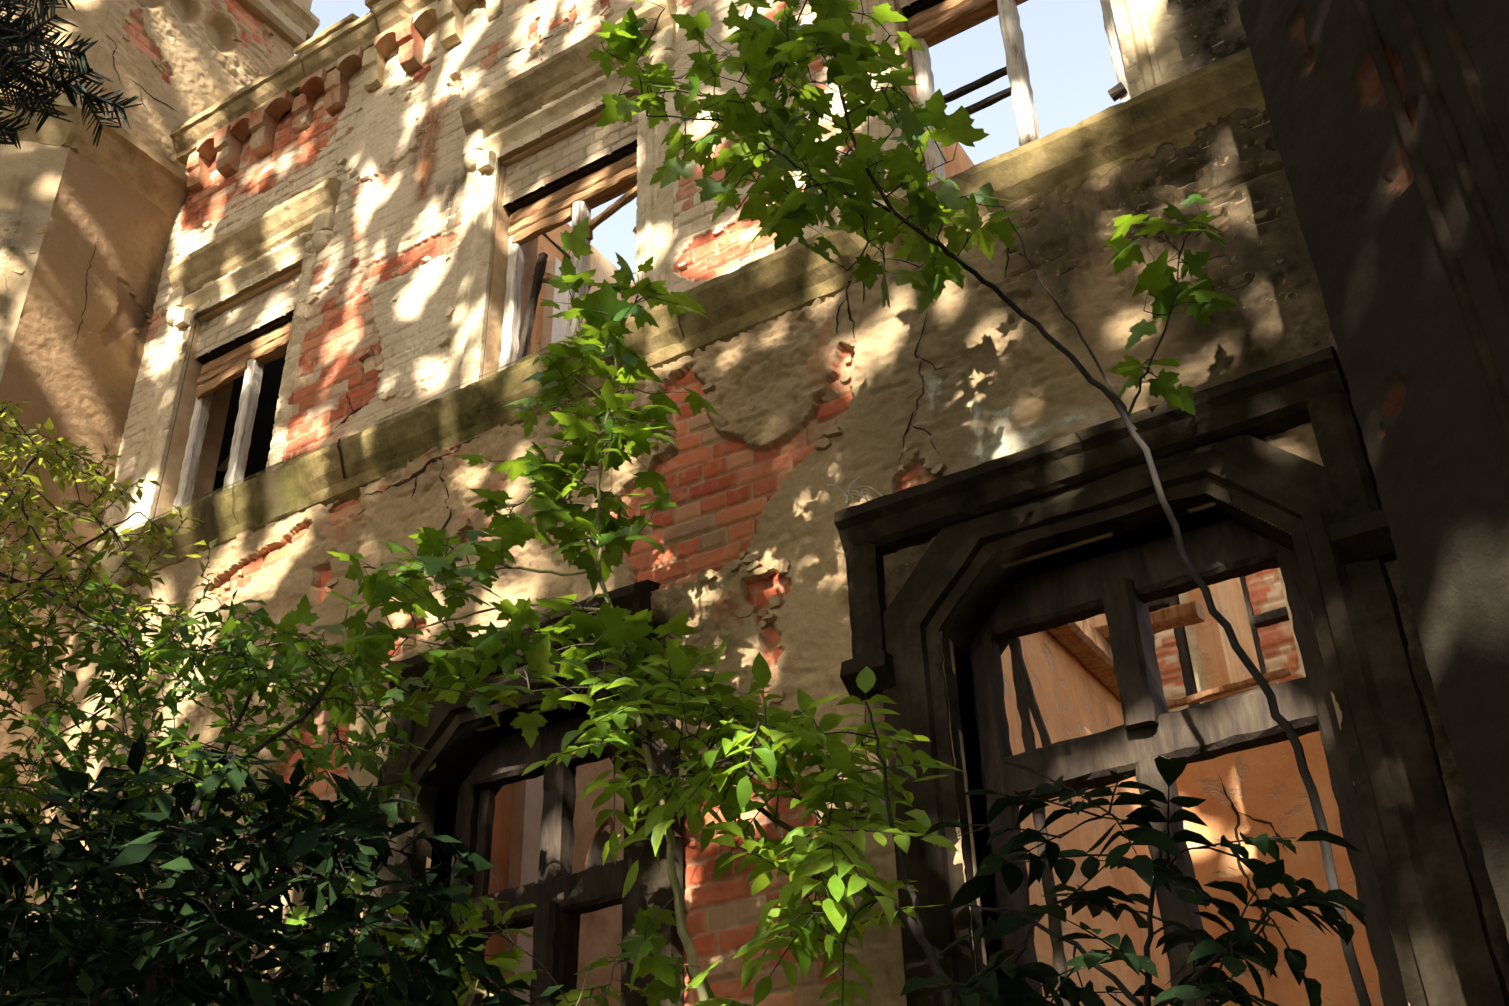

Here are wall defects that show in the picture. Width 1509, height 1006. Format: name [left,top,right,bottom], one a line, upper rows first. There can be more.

crack [72,235,101,352]
spalling [99,277,153,349]
spalling [268,233,458,468]
crack [899,314,946,461]
spalling [207,497,365,606]
spalling [610,344,855,706]